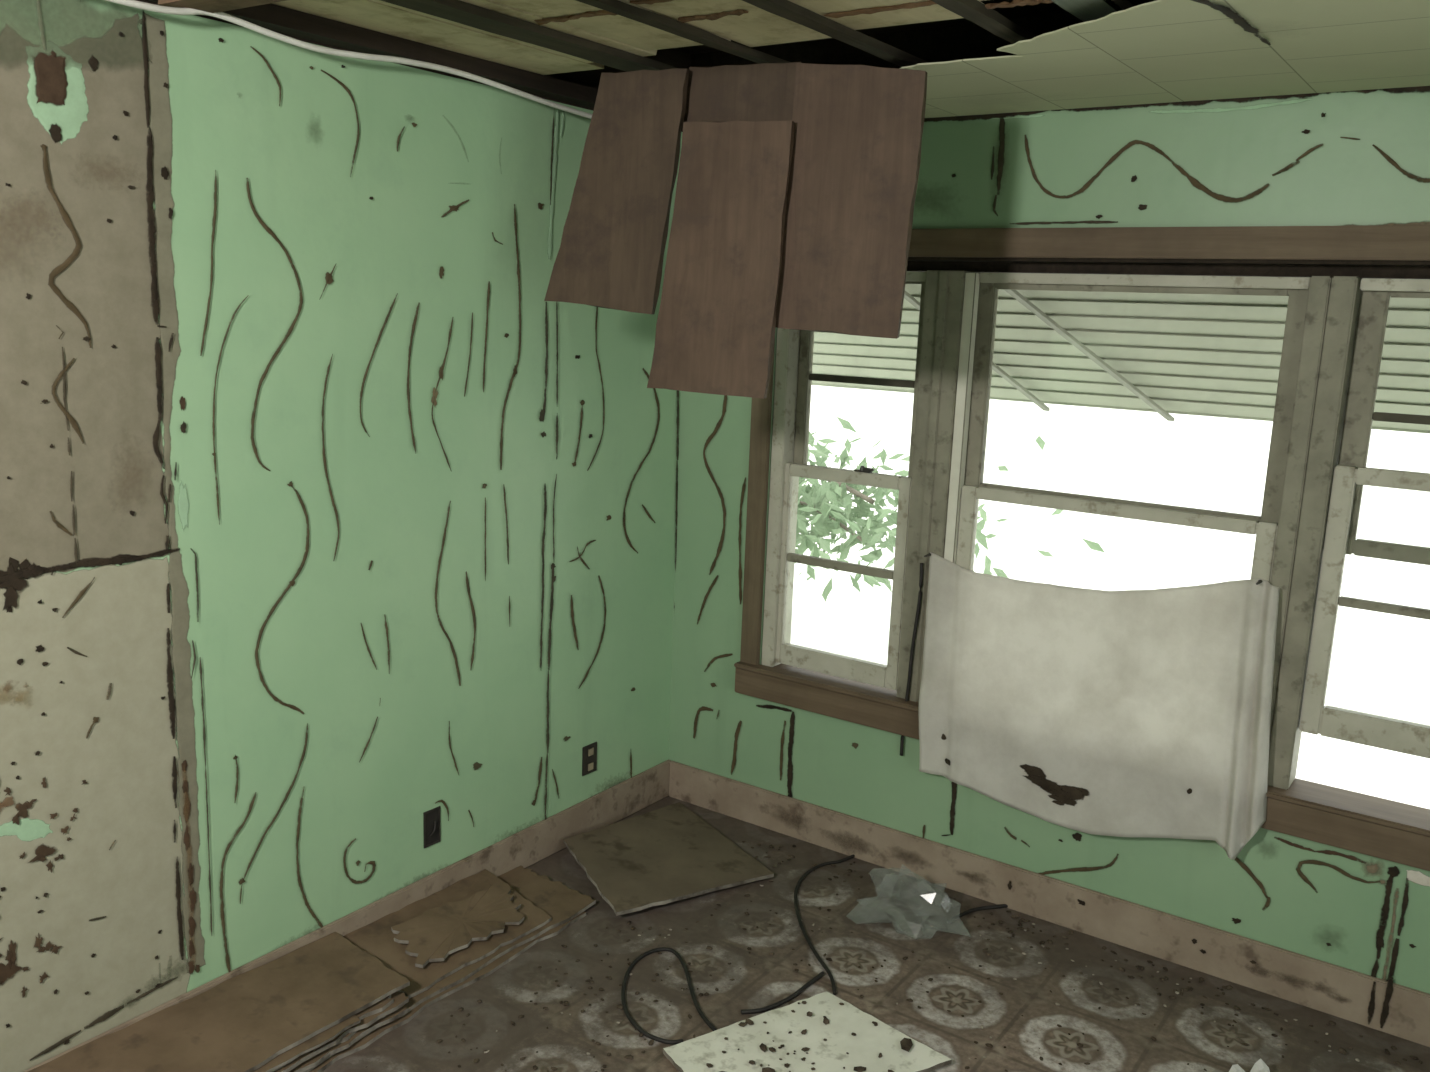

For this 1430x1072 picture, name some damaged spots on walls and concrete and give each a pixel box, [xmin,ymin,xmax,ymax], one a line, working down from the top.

crack [1192,0,1271,45]
crack [547,109,564,260]
crack [924,86,1430,225]
peeling [0,13,205,1072]
crack [539,302,559,820]
crack [673,390,681,570]
crack [1274,837,1409,1028]